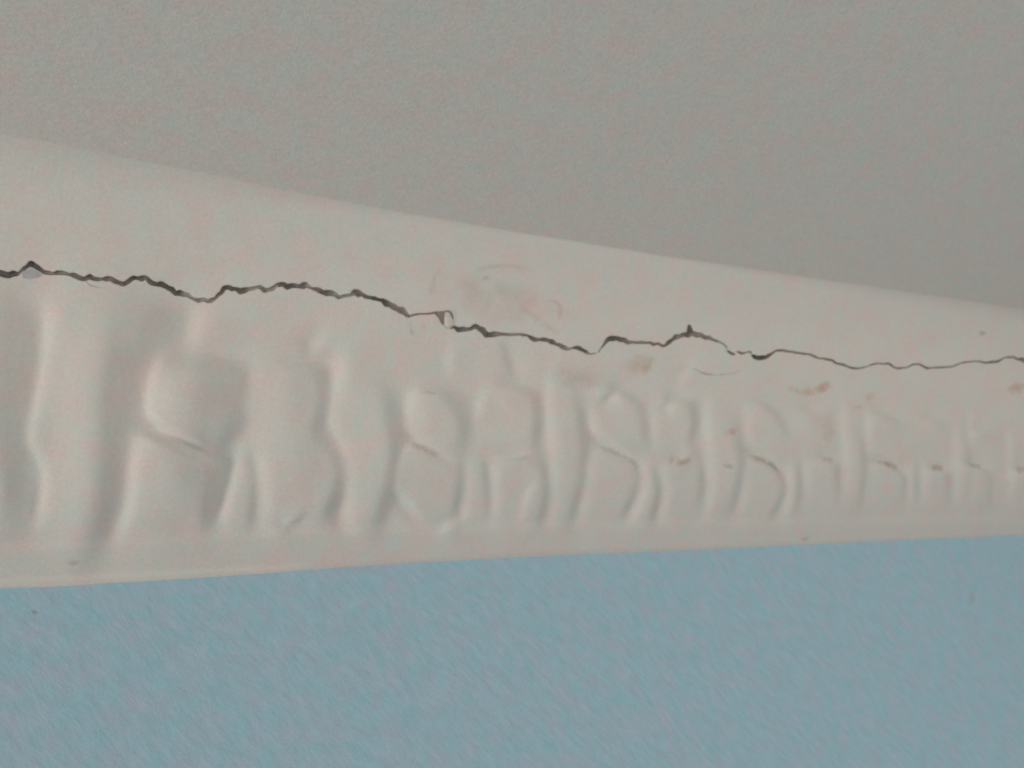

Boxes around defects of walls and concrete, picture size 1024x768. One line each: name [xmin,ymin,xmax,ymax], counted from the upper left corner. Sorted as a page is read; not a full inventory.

crack [0,261,1024,369]